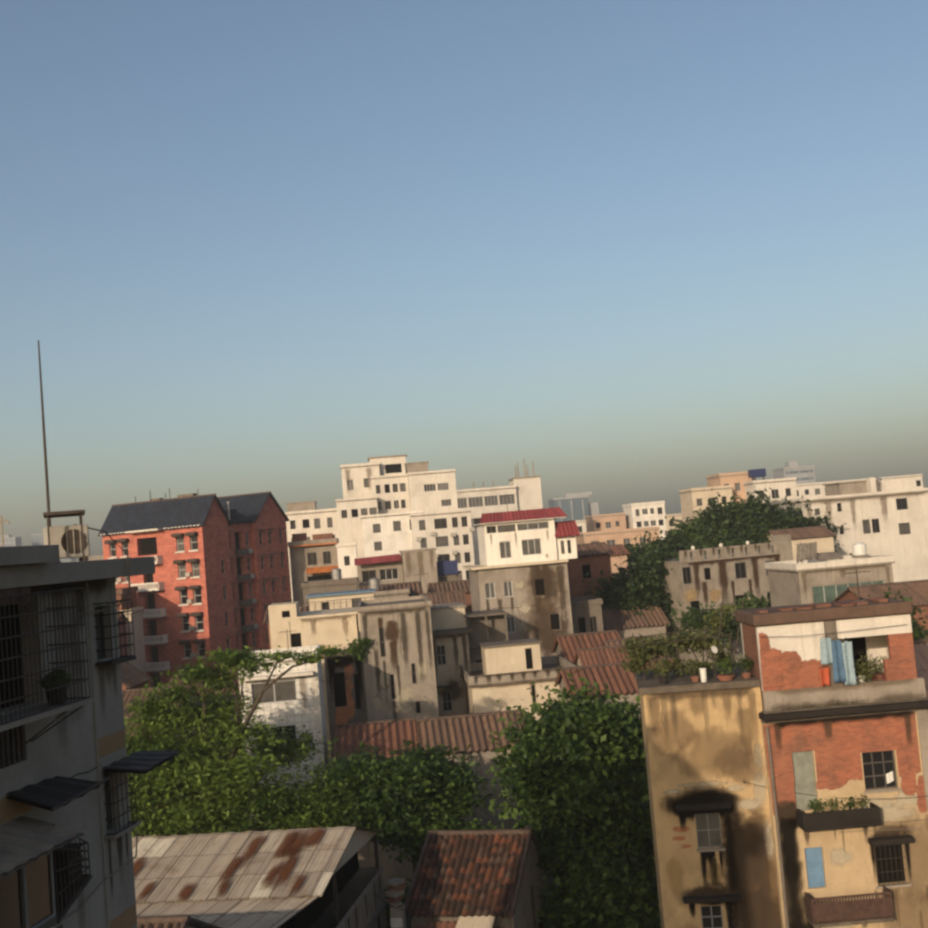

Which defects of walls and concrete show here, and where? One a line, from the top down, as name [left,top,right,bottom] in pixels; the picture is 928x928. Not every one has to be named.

damp [363,607,468,689]
damp [474,668,560,693]
flaking render [758,633,828,692]
flaking render [740,712,927,821]
corrosion [138,882,155,898]
corrosion [178,884,194,900]
corrosion [218,837,265,896]
corrosion [262,829,324,892]
damp [668,788,814,928]